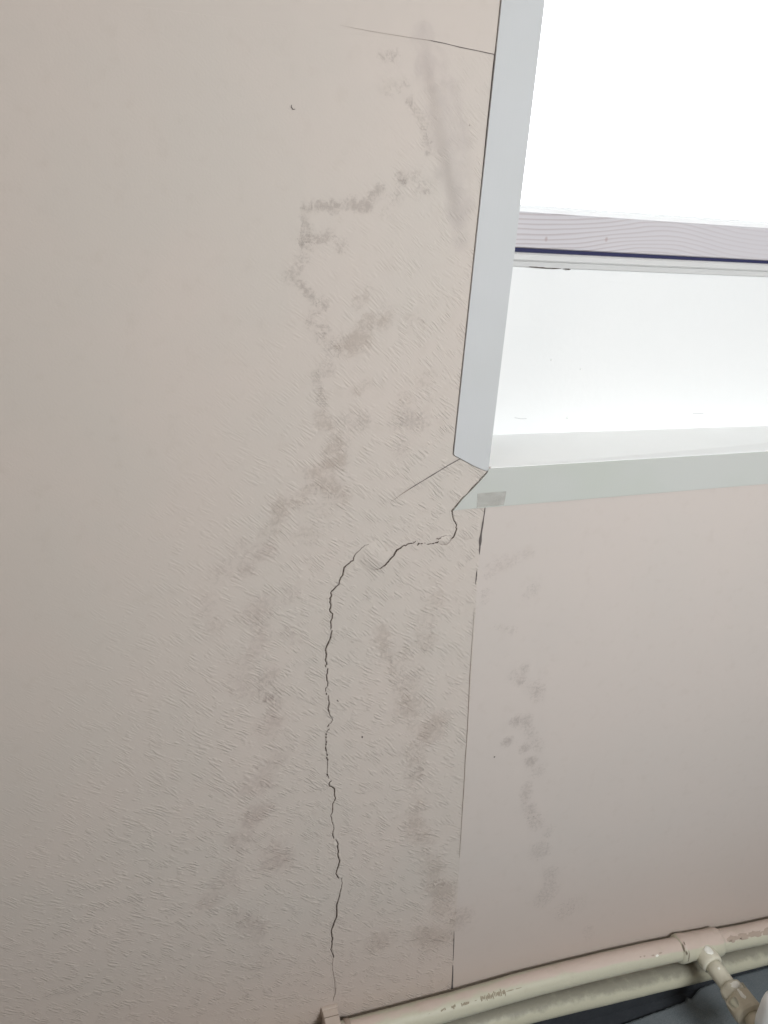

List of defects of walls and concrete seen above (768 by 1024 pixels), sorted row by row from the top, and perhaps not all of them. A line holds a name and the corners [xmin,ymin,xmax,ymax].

crack [322,467,491,1002]
crack [392,459,460,501]